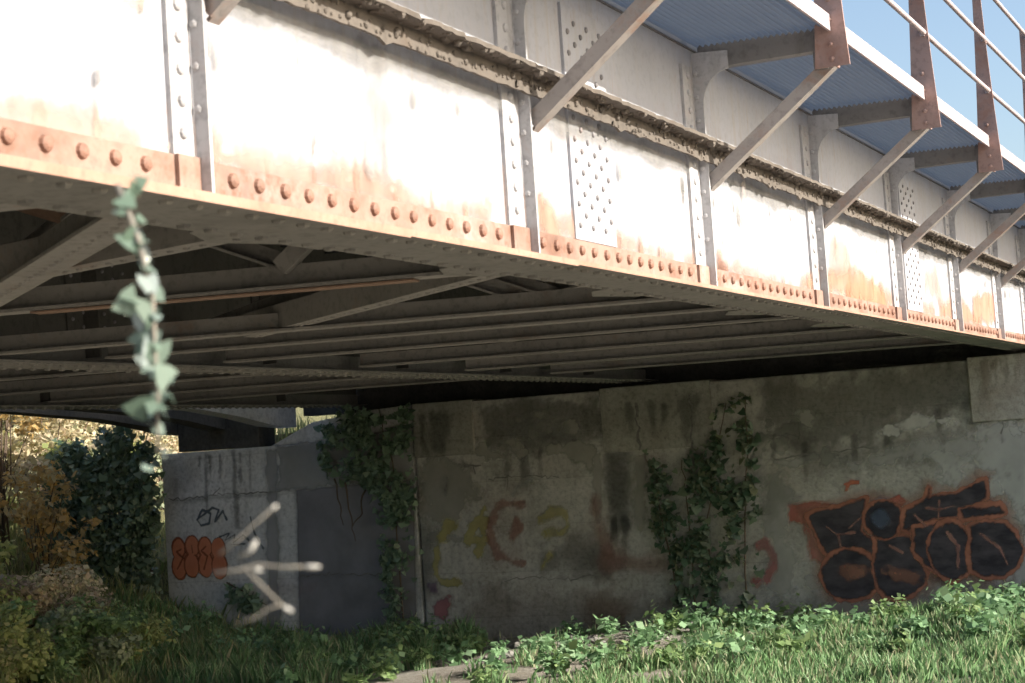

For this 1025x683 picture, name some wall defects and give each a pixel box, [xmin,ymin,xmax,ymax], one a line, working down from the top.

corrosion [0,104,136,146]
corrosion [212,131,433,207]
corrosion [524,193,644,254]
corrosion [802,269,907,306]
corrosion [923,292,995,327]
crack [969,419,1025,434]